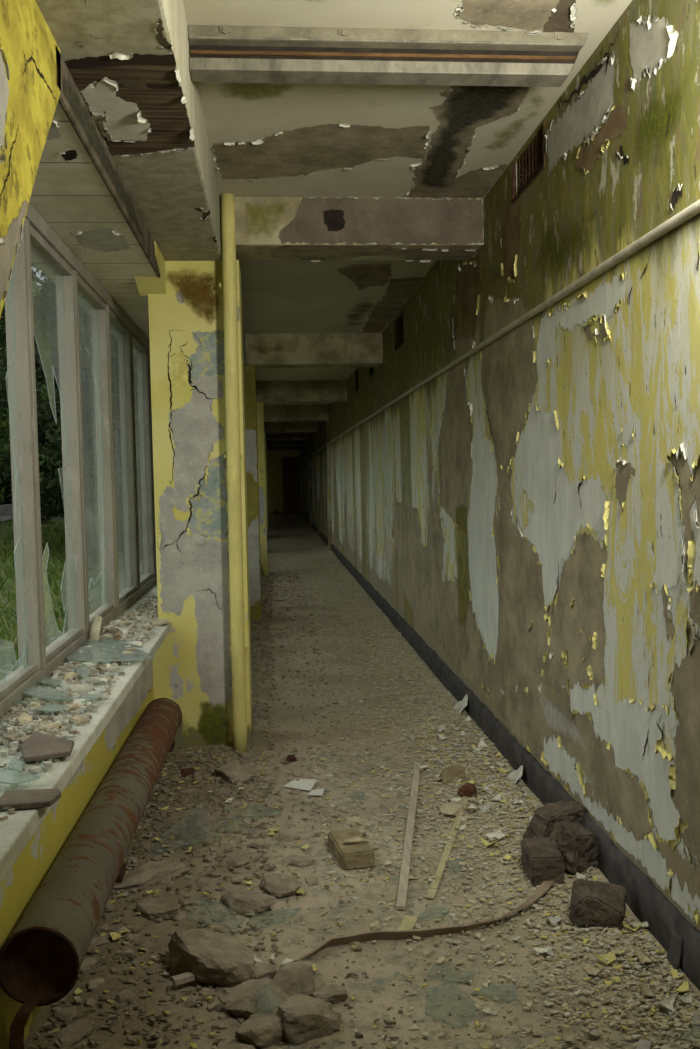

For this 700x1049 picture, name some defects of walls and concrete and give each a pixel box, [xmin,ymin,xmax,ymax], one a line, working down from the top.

flaking render [0,47,10,164]
crack [0,123,20,205]
crack [0,44,58,103]
spalling [64,18,195,157]
peeling [211,86,530,333]
peeling [454,0,578,35]
flaking render [562,104,628,174]
mould [167,274,217,320]
crack [163,330,215,553]
flaking render [157,329,232,706]
flaking render [245,429,266,607]
flaking render [392,199,700,869]